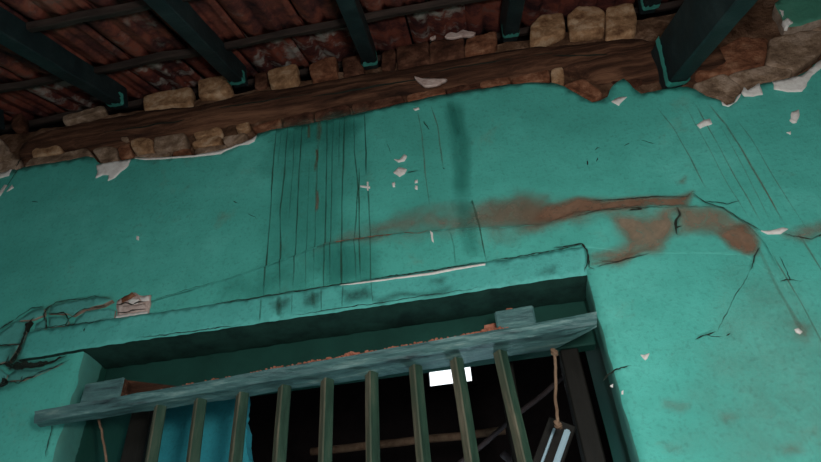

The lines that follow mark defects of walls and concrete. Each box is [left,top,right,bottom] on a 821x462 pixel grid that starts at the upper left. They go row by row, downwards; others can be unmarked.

peeling [780,10,793,31]
peeling [772,60,821,92]
peeling [721,83,763,107]
peeling [96,135,257,181]
peeling [392,154,407,187]
crack [574,191,760,340]
spalling [0,292,151,387]